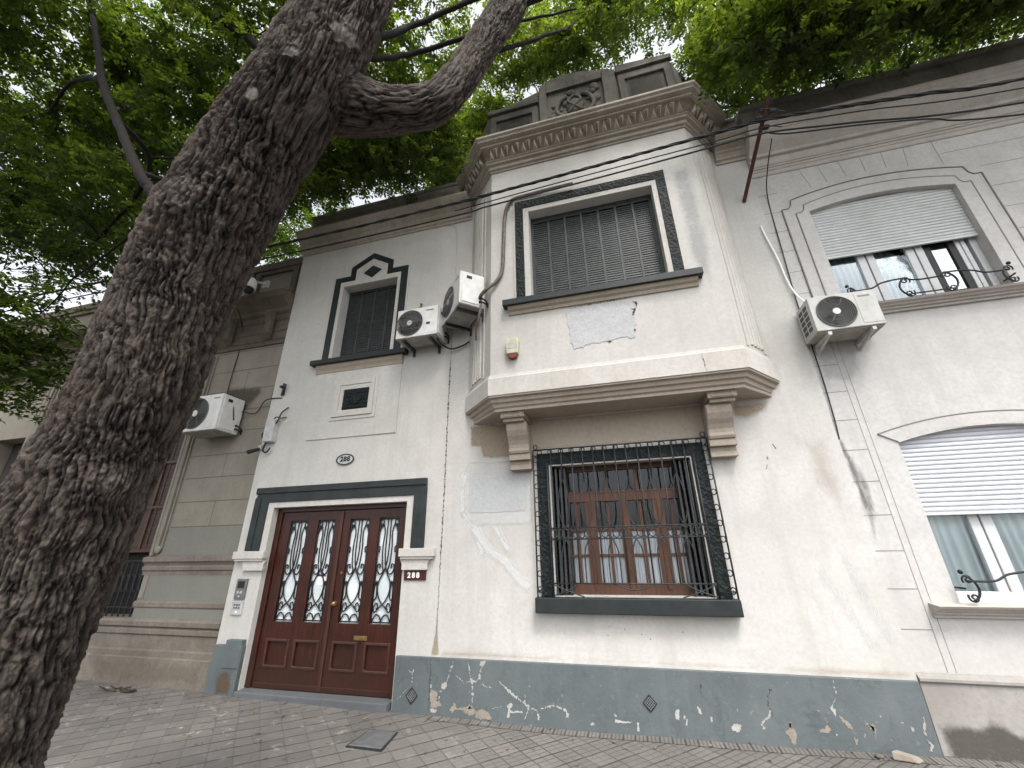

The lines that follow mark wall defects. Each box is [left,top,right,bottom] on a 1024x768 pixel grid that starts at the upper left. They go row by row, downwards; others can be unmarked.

crack [436,330,453,628]
spalling [429,685,492,721]
spalling [785,721,797,745]
spalling [892,717,934,764]
water stain [945,727,1024,763]